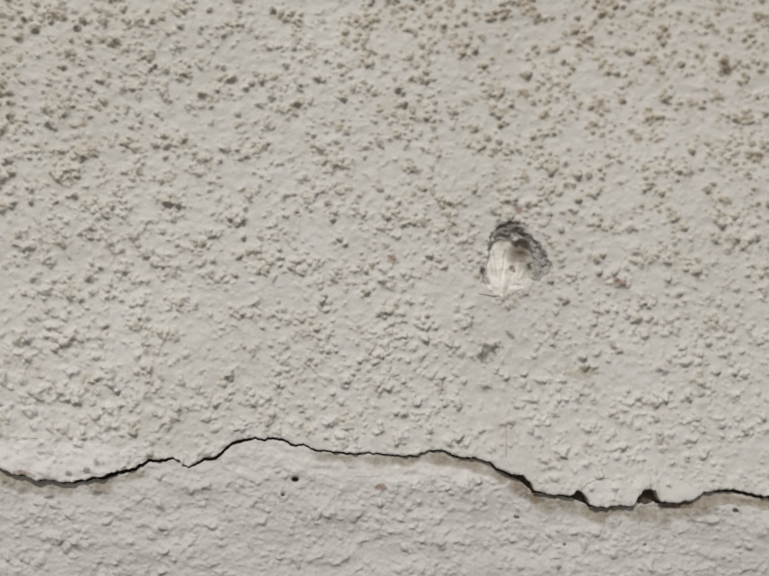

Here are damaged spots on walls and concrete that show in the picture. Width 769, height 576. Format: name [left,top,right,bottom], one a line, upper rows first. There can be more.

crack [21,391,672,508]
crack [712,489,769,499]